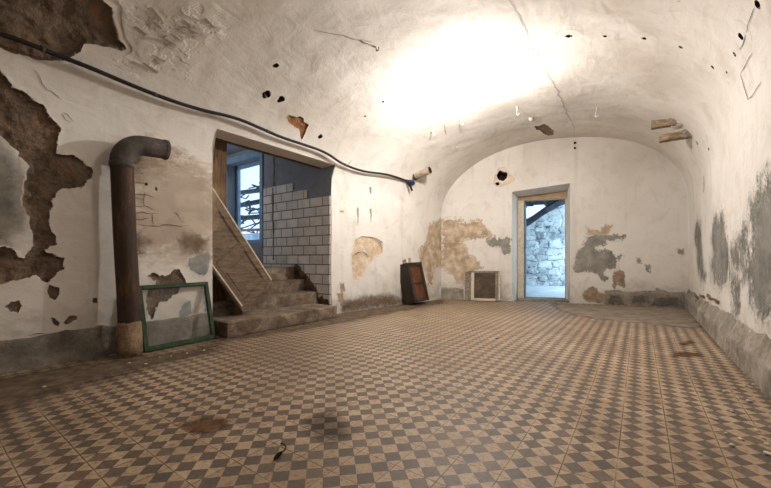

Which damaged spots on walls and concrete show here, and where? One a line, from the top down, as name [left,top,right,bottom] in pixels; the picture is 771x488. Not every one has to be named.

spalling [253,83,329,147]
spalling [0,0,247,334]
spalling [490,165,514,191]
spalling [337,230,387,302]
peeling [418,216,512,287]
peeling [573,225,678,307]